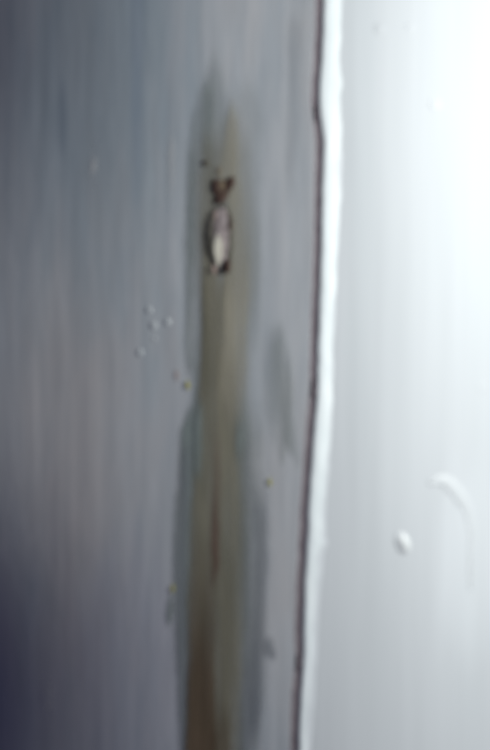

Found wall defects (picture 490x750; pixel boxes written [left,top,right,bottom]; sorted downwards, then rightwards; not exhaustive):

corrosion [187,238,245,750]